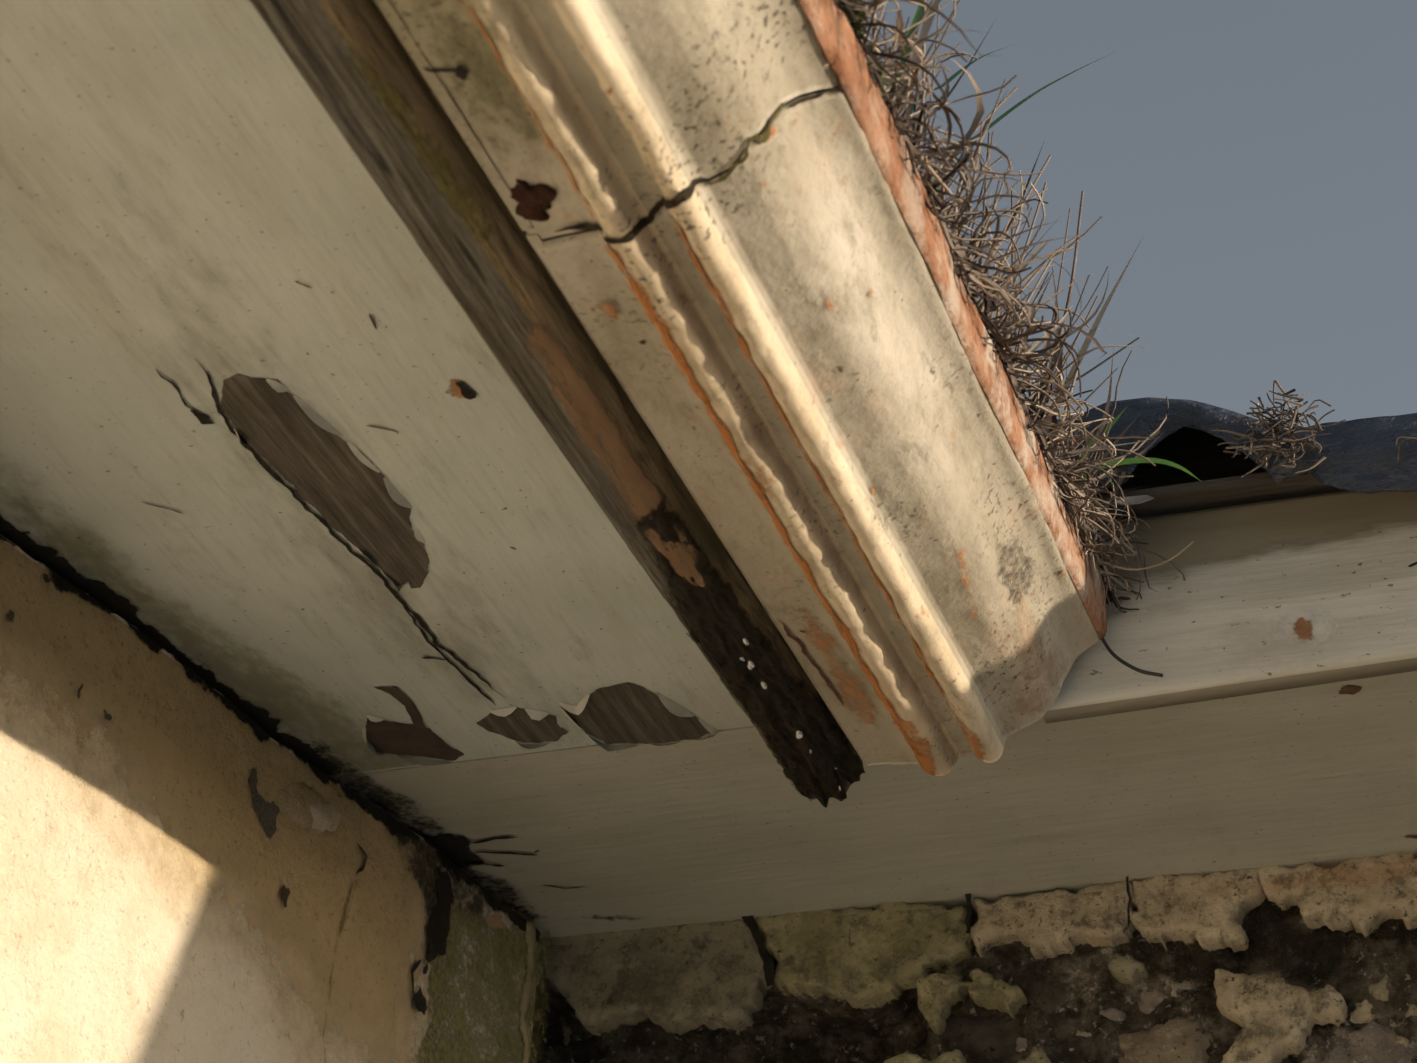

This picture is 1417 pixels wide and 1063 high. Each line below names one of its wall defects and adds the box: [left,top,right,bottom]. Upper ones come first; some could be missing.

rust [460,0,593,222]
crack [555,87,843,244]
peeling [221,374,429,591]
rust [605,219,984,775]
peeling [740,639,767,689]
peeling [362,687,464,766]
peeling [476,682,719,751]
water stain [0,515,545,1062]
spalling [248,768,341,839]
peeling [1099,977,1197,1021]
peeling [1350,974,1390,1024]
peeling [1016,1037,1027,1052]